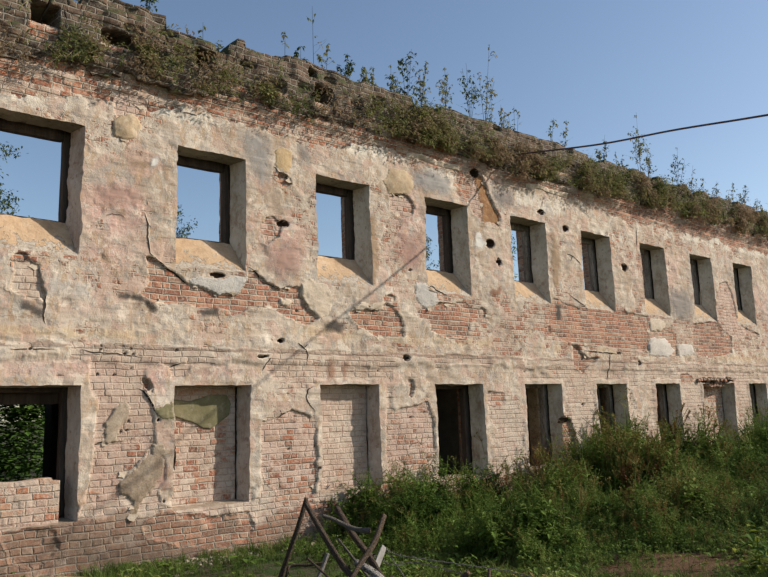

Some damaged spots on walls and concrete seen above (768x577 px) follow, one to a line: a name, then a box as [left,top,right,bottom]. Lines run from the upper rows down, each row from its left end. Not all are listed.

crack [145,213,189,285]
crack [40,296,48,324]
flaking render [140,255,332,325]
flaking render [415,283,492,340]
flaking render [544,281,759,374]
crack [140,388,158,416]
flaking render [141,377,159,396]
flaking render [88,403,256,551]
flaking render [260,408,339,527]
flaking render [378,379,437,505]